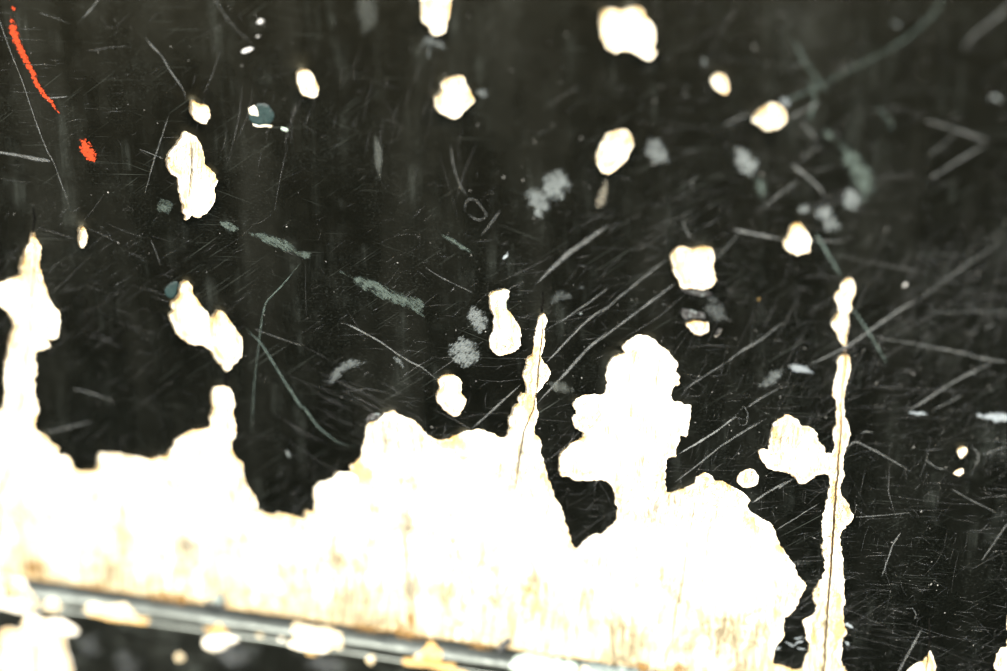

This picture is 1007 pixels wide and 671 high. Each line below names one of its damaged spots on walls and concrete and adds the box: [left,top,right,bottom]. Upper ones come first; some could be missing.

peeling [421,0,450,34]
peeling [600,6,655,59]
peeling [191,99,210,123]
peeling [297,69,318,97]
peeling [434,76,474,118]
peeling [753,103,785,129]
peeling [596,129,632,173]
peeling [166,131,218,219]
peeling [784,223,811,254]
peeling [0,232,855,671]
peeling [907,651,936,671]
peeling [994,641,1007,671]